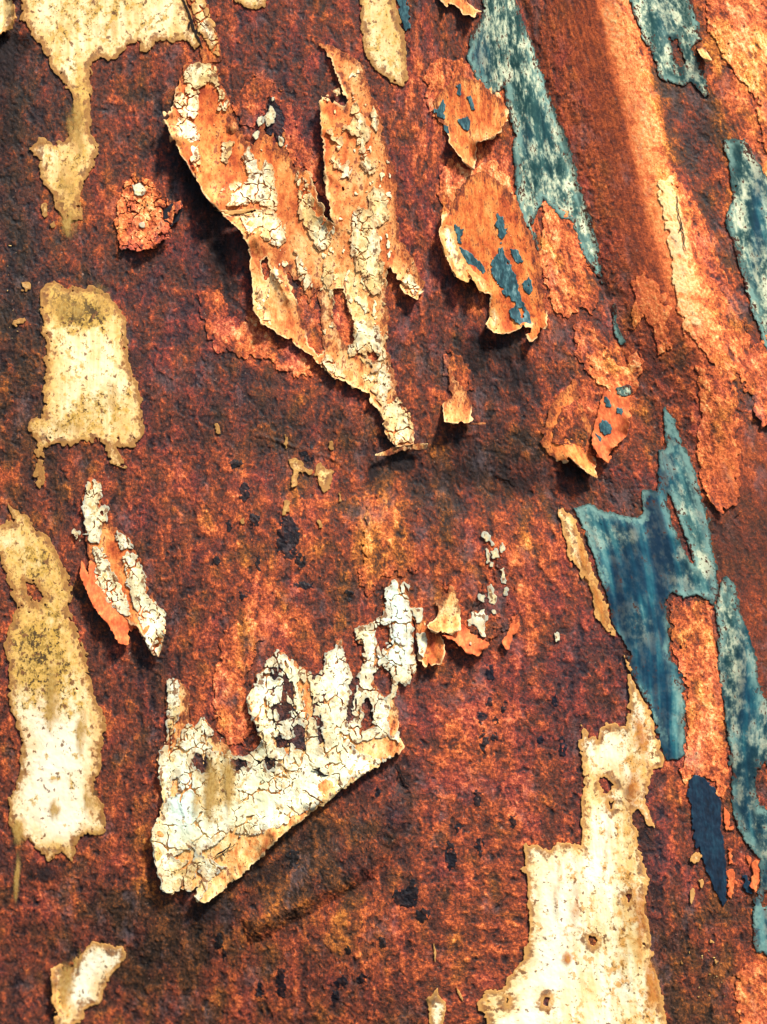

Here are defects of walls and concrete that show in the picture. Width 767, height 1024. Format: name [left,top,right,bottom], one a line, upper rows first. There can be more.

peeling [21,276,145,489]
peeling [0,0,428,456]
rust [197,272,354,378]
peeling [433,0,604,342]
rust [539,201,644,397]
rust [629,172,767,514]
rust [706,0,767,152]
peeling [0,479,166,863]
rust [212,617,266,746]
peeling [150,531,520,903]
peeling [477,407,767,1024]
rust [669,597,729,798]